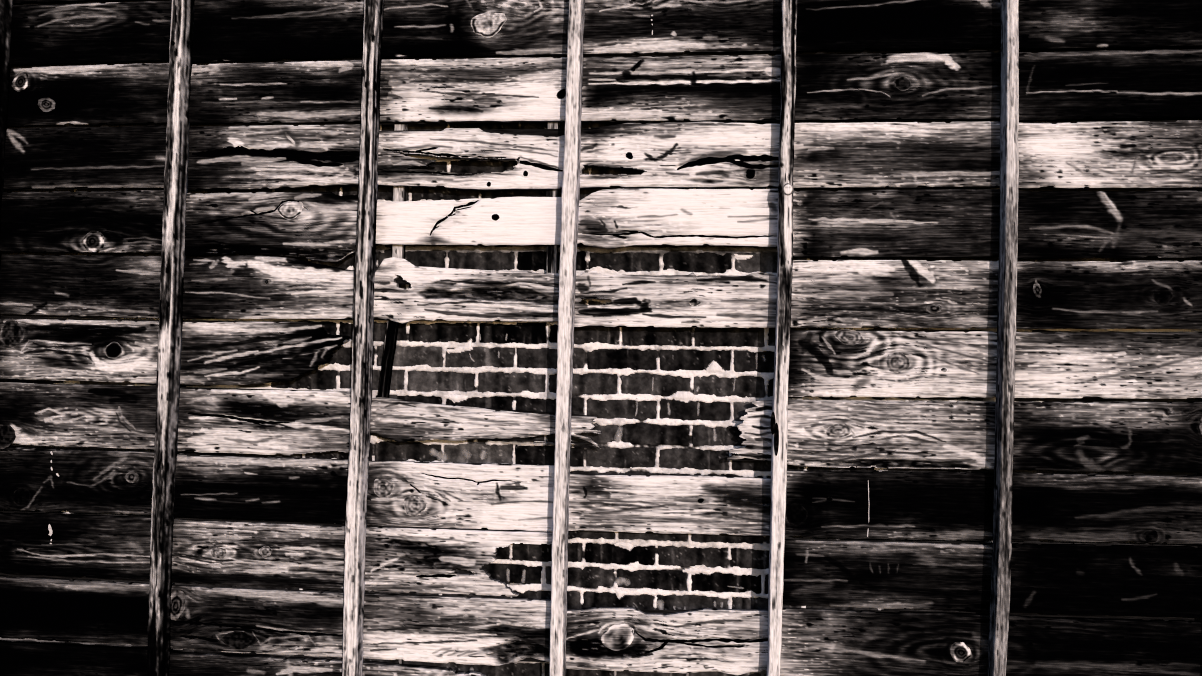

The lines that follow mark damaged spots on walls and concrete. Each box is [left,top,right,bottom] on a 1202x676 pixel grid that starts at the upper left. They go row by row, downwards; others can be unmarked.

crack [187,145,563,236]